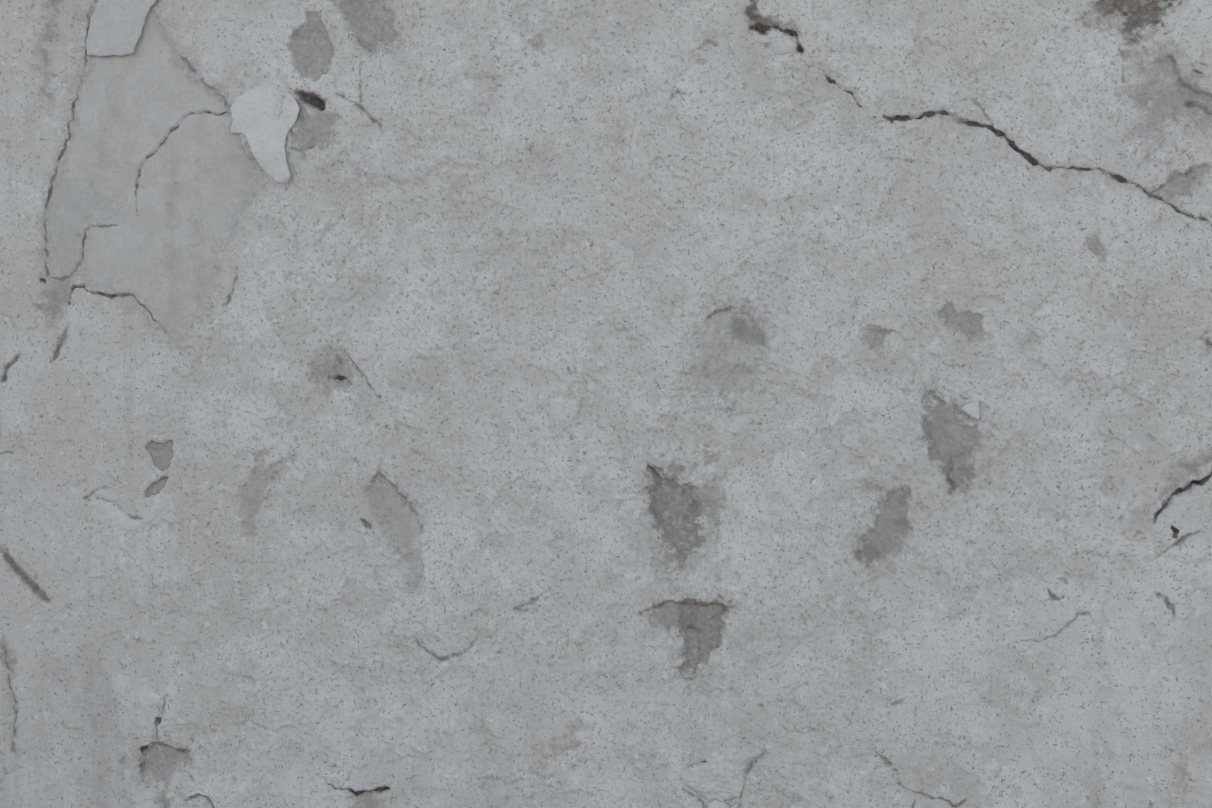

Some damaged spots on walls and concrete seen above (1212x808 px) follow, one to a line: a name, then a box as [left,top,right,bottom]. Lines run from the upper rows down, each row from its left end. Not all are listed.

flaking render [1097,0,1180,43]
flaking render [41,0,335,336]
crack [825,75,1207,220]
flaking render [924,392,980,491]
flaking render [646,465,723,562]
flaking render [857,492,908,560]
crack [1154,475,1211,545]
flaking render [653,598,728,680]
crack [330,780,390,796]